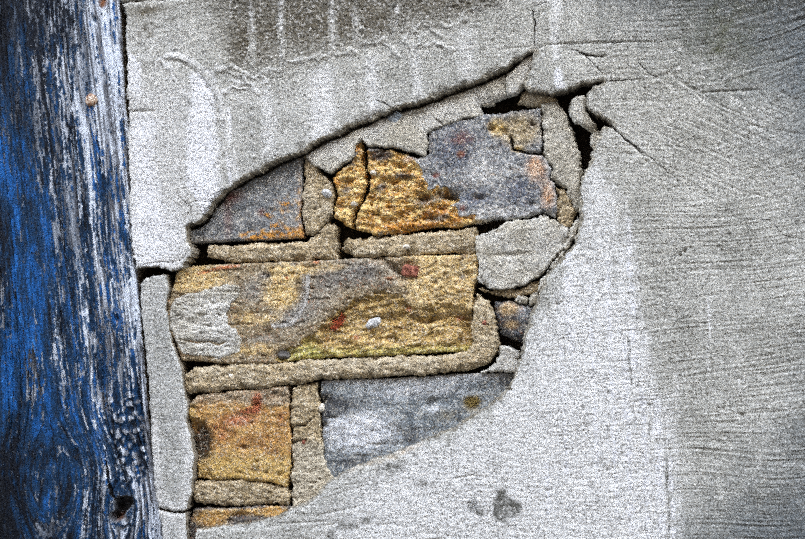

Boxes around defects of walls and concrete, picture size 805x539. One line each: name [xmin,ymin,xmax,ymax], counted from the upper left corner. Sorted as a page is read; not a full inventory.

crack [532,3,705,83]
spalling [180,47,558,269]
crack [604,120,670,174]
spalling [427,77,616,439]
spalling [276,290,473,363]